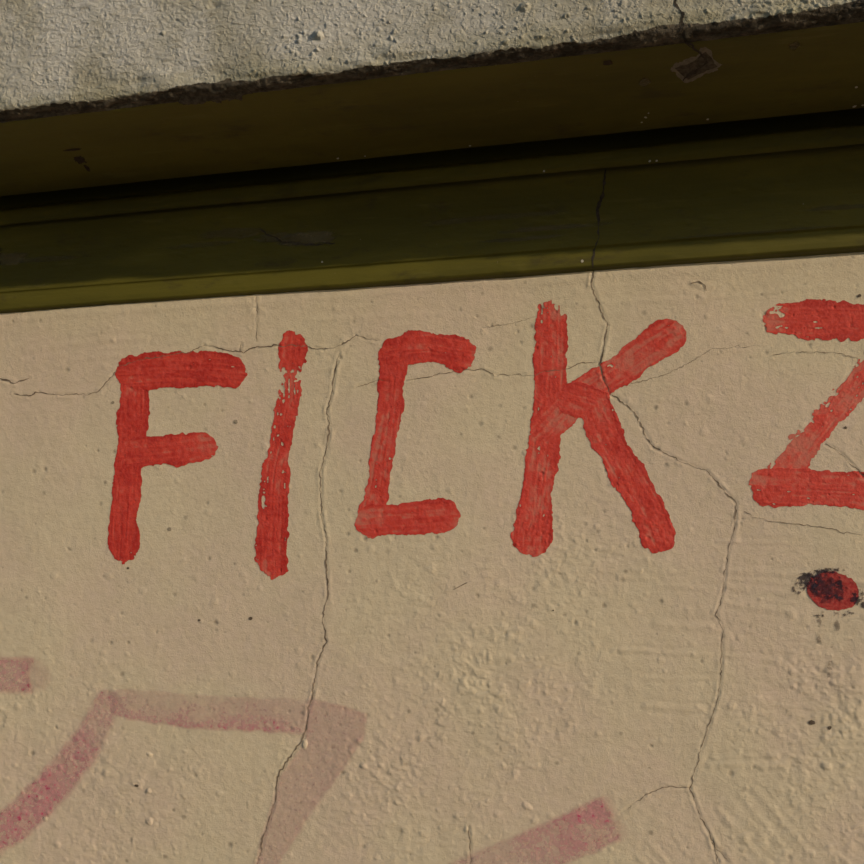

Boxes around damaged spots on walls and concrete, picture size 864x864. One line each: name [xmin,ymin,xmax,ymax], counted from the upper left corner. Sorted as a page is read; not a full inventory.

crack [674,0,706,60]
crack [0,304,377,864]
crack [410,170,860,864]